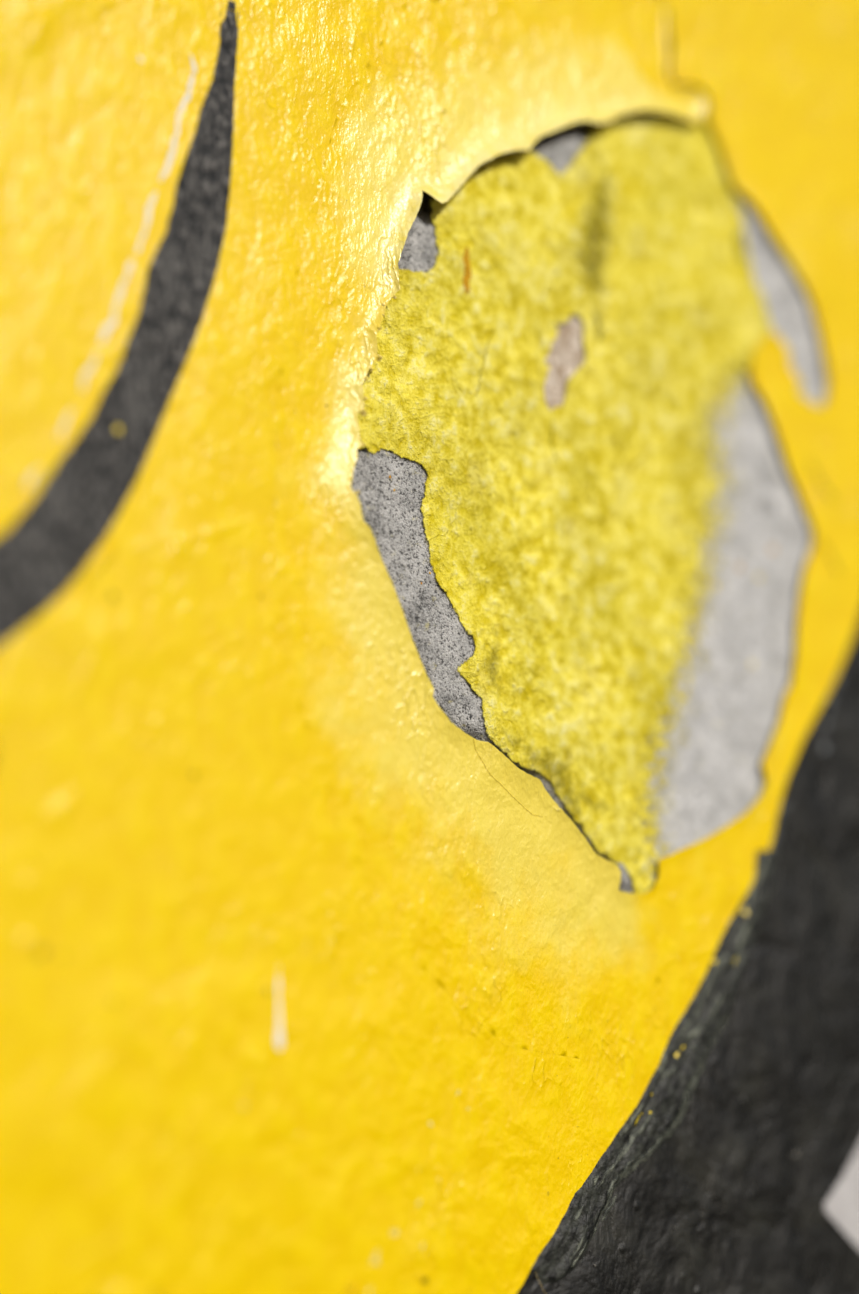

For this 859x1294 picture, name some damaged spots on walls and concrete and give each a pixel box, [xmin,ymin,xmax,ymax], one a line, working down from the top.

peeling [273,0,849,1285]